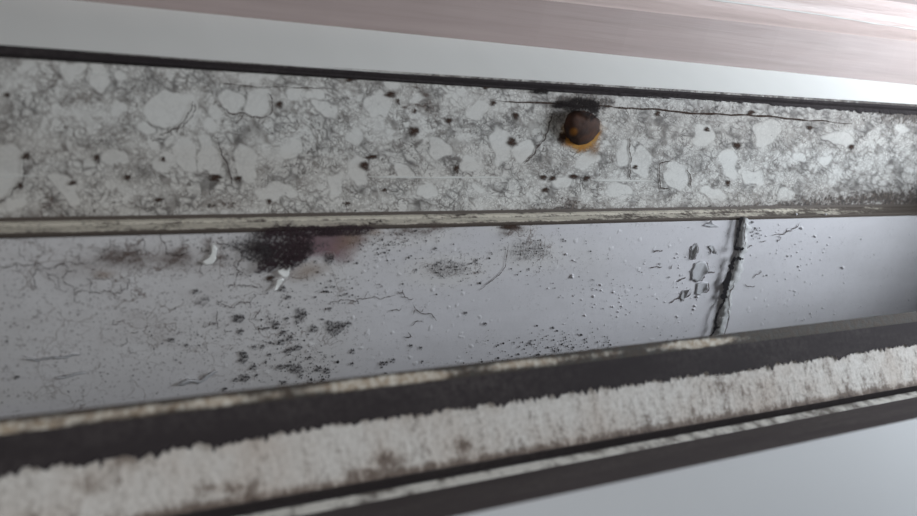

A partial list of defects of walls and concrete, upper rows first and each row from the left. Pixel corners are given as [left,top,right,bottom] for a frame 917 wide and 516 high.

corrosion [558,130,601,152]
water stain [198,220,552,391]
water stain [455,322,618,364]
crack [711,217,799,335]
water stain [0,344,917,516]